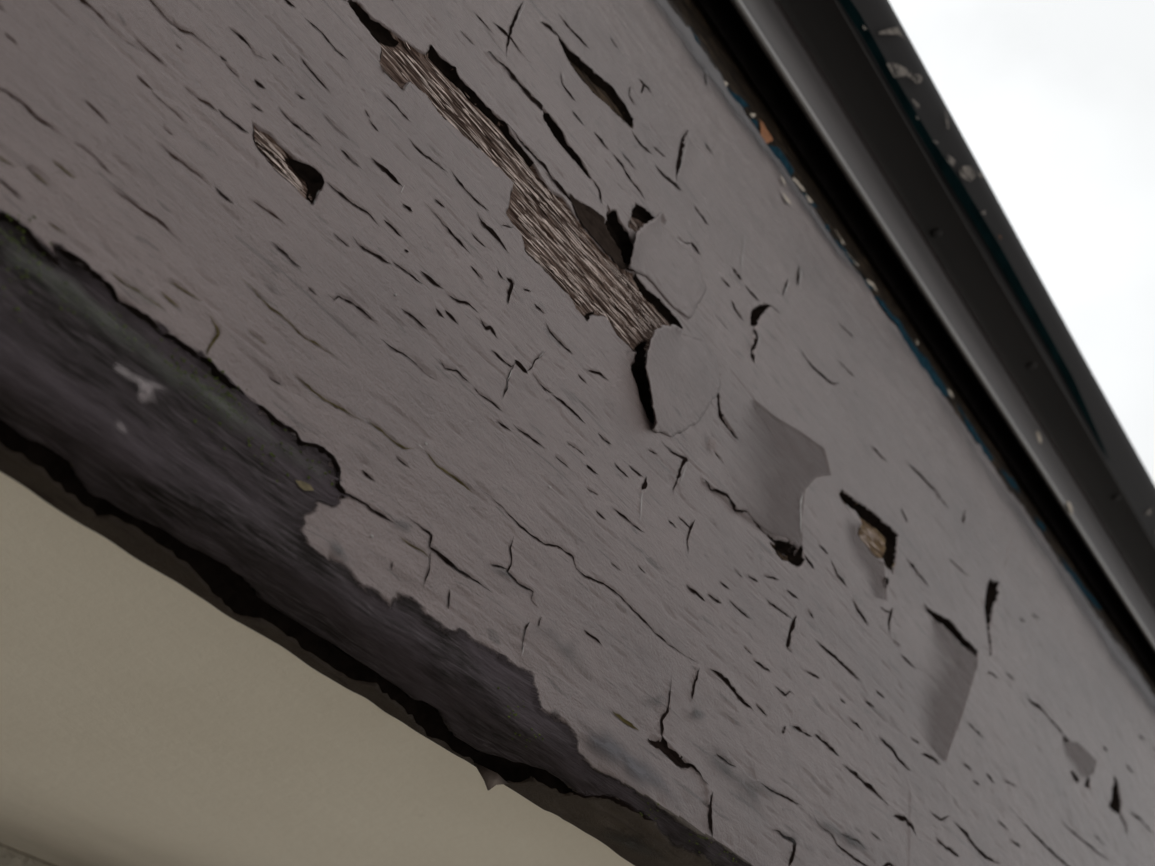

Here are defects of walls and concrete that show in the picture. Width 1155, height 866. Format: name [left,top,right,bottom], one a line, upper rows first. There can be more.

crack [0,88,181,241]
peeling [253,124,325,203]
peeling [349,0,721,437]
crack [721,236,802,363]
crack [801,351,854,385]
peeling [667,0,1155,695]
peeling [0,210,752,866]
crack [268,374,1151,866]
peeling [925,579,999,761]
peeling [1064,737,1097,789]
peeling [1109,778,1122,814]